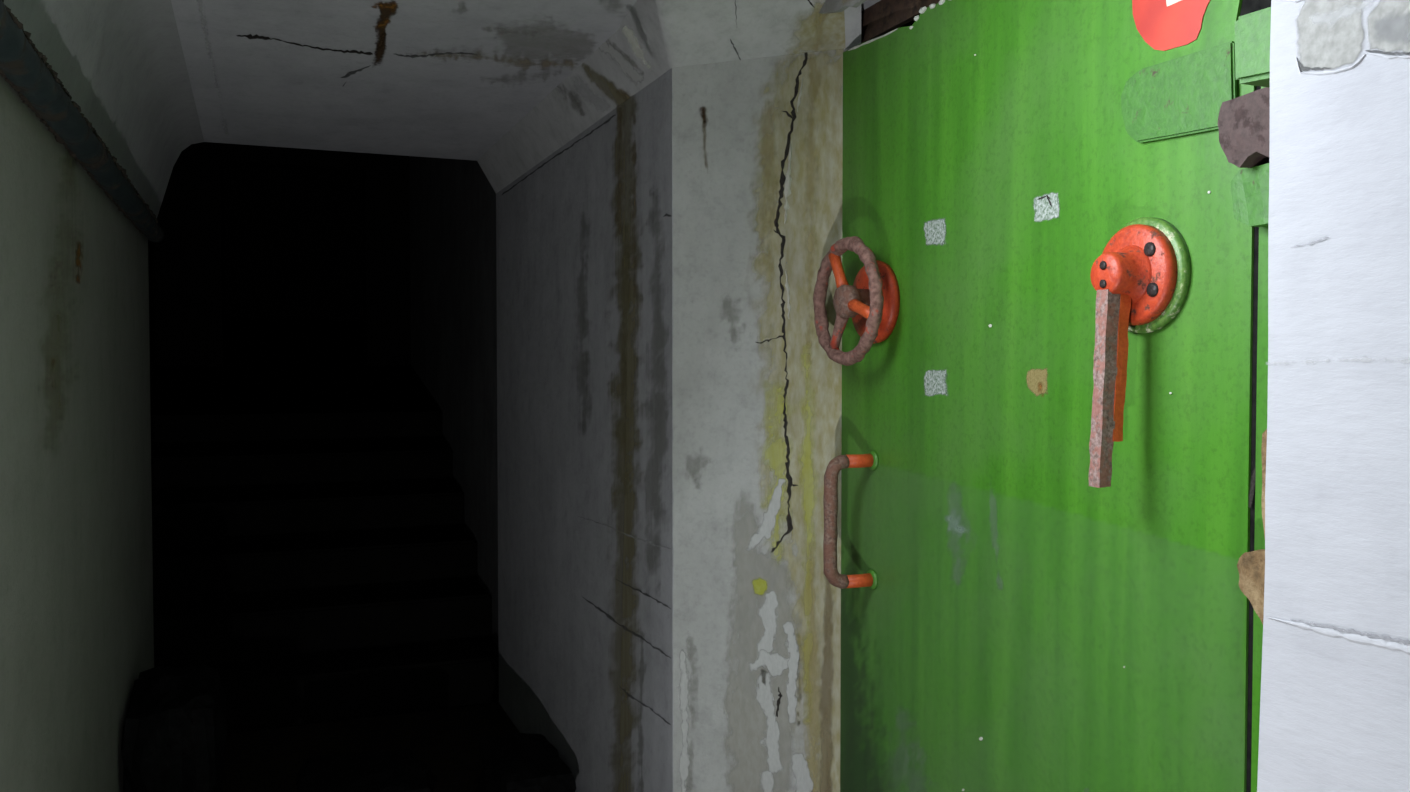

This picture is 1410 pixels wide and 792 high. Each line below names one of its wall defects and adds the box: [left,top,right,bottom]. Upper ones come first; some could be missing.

crack [238,34,477,86]
corrosion [372,1,398,65]
peeling [848,0,945,51]
peeling [1286,0,1410,75]
water stain [437,28,639,792]
crack [756,52,808,553]
water stain [754,3,846,792]
peeling [725,479,813,792]